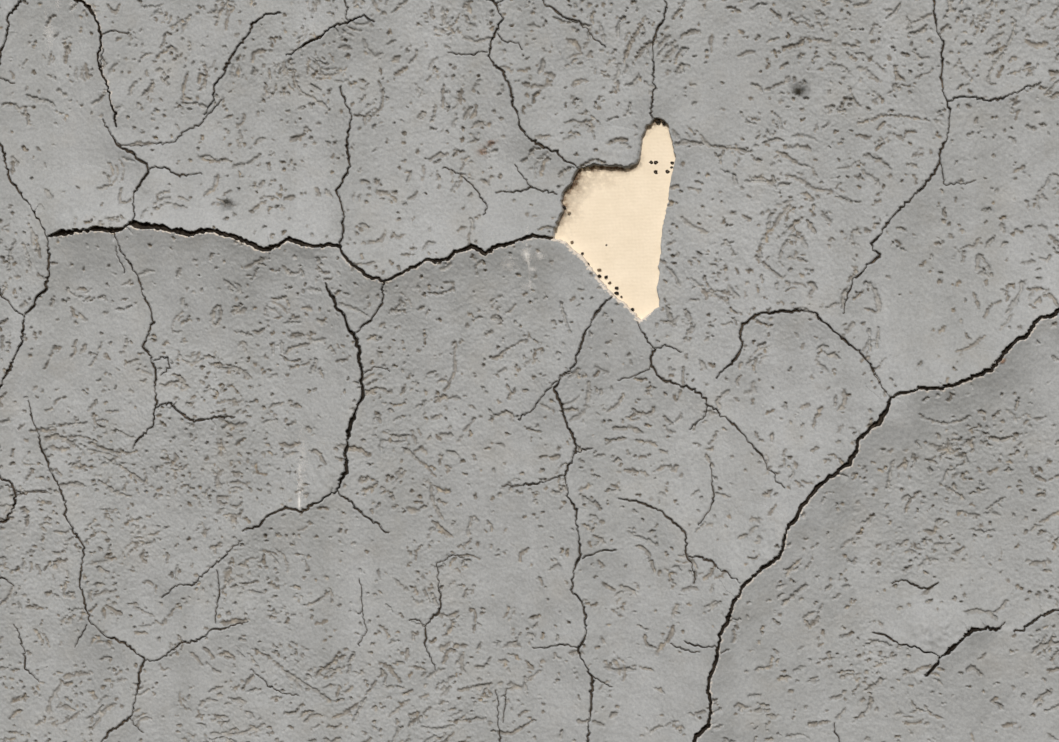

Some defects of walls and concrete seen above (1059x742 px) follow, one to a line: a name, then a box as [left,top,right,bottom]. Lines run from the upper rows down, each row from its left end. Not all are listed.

crack [0,0,557,742]
crack [449,0,576,166]
crack [502,297,615,742]
crack [543,0,604,46]
spalling [554,119,676,320]
crack [618,0,1059,742]